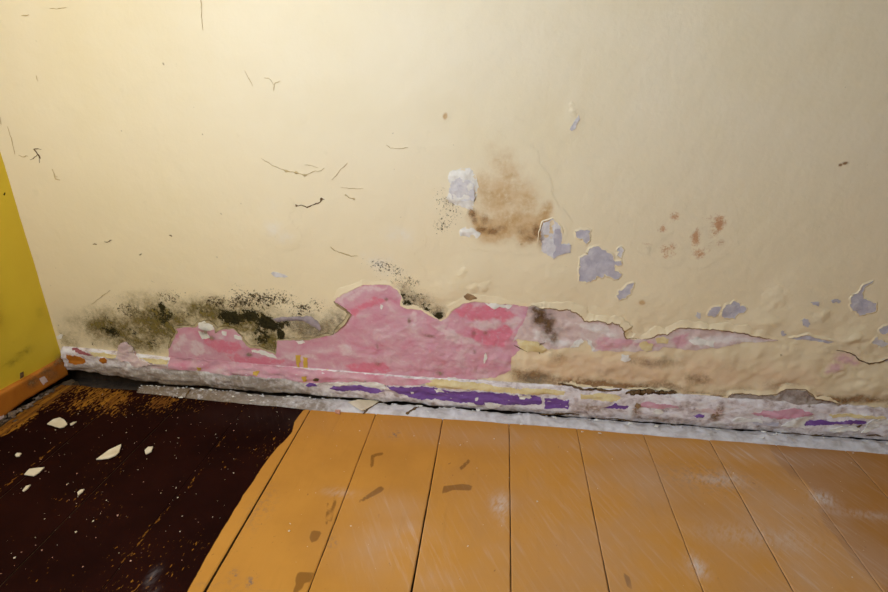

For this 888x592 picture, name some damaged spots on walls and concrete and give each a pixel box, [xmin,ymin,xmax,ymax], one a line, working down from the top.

water stain [84,289,333,351]
water stain [350,130,572,319]
peeling [66,279,888,433]
peeling [537,217,636,301]